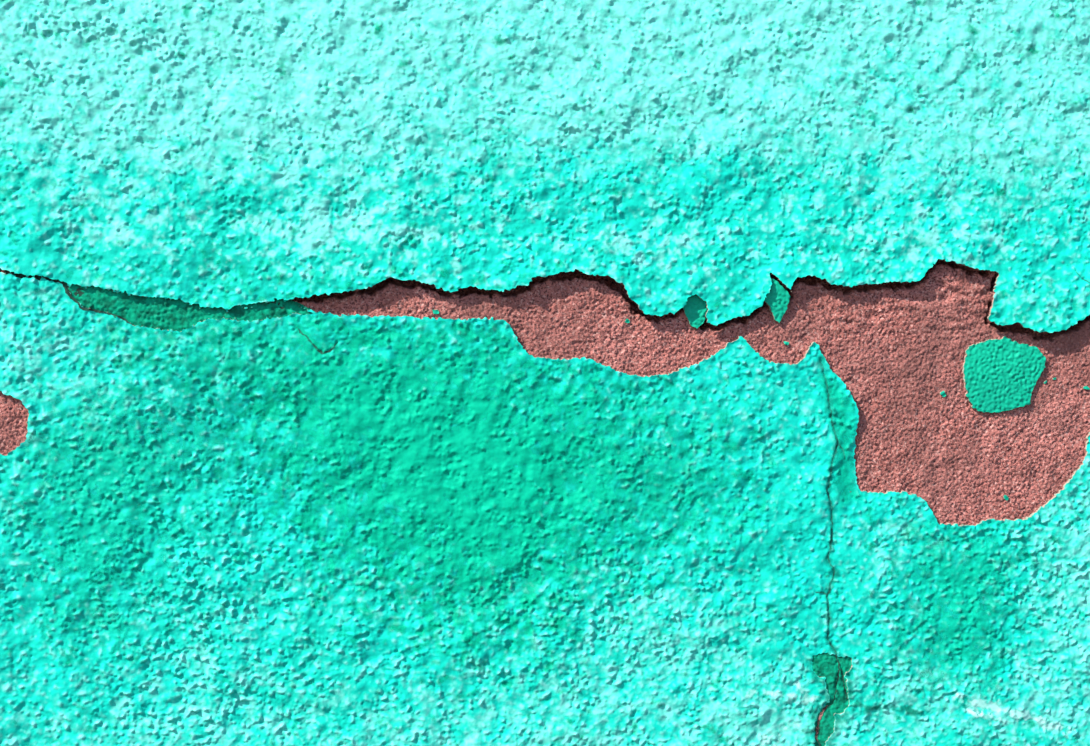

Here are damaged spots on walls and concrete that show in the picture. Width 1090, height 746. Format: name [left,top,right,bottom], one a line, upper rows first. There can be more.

peeling [0,391,29,456]
crack [0,268,134,325]
peeling [63,259,1090,526]
crack [815,362,847,746]